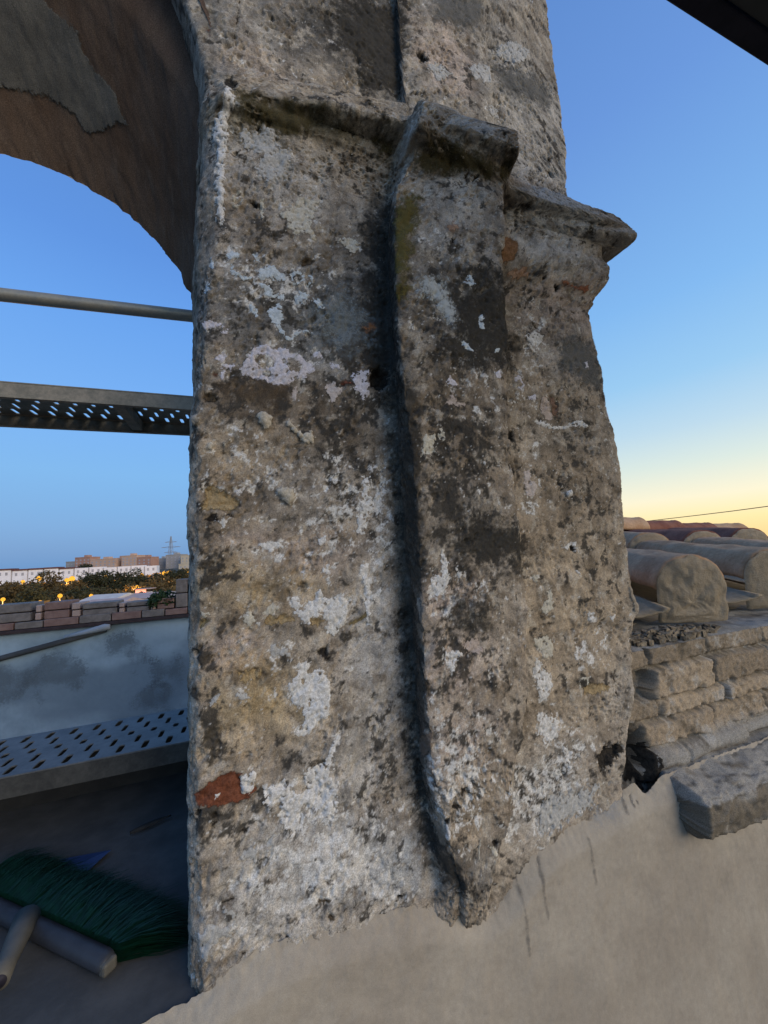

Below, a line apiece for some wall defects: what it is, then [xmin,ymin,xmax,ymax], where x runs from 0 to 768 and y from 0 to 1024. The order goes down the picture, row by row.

flaking render [0,0,127,135]
peeling [194,734,341,838]